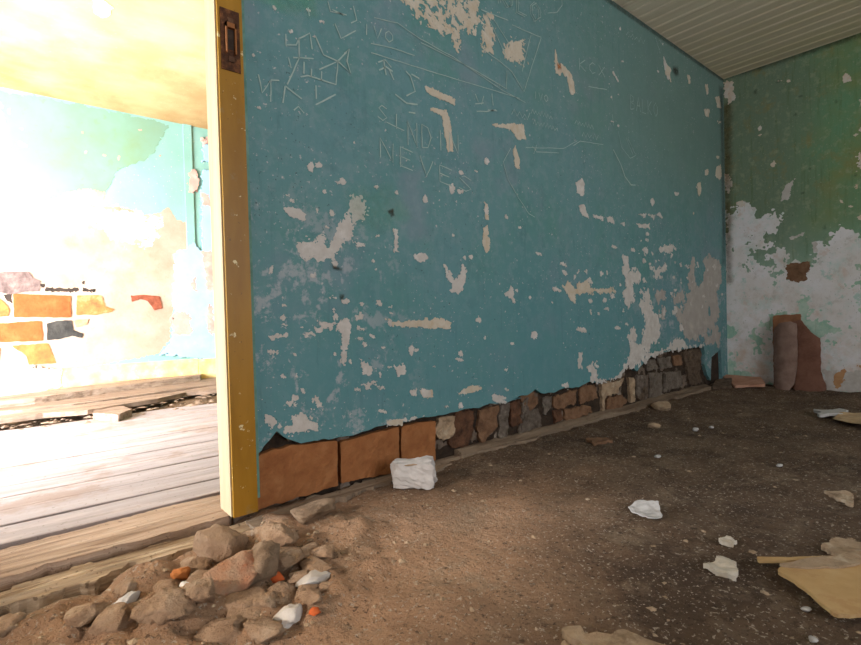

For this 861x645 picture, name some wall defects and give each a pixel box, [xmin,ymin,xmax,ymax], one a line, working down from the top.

peeling [400,0,529,67]
peeling [554,49,575,95]
peeling [187,137,210,206]
peeling [425,86,456,152]
peeling [492,123,526,169]
peeling [696,156,732,196]
peeling [0,187,193,396]
flaking render [258,178,861,510]